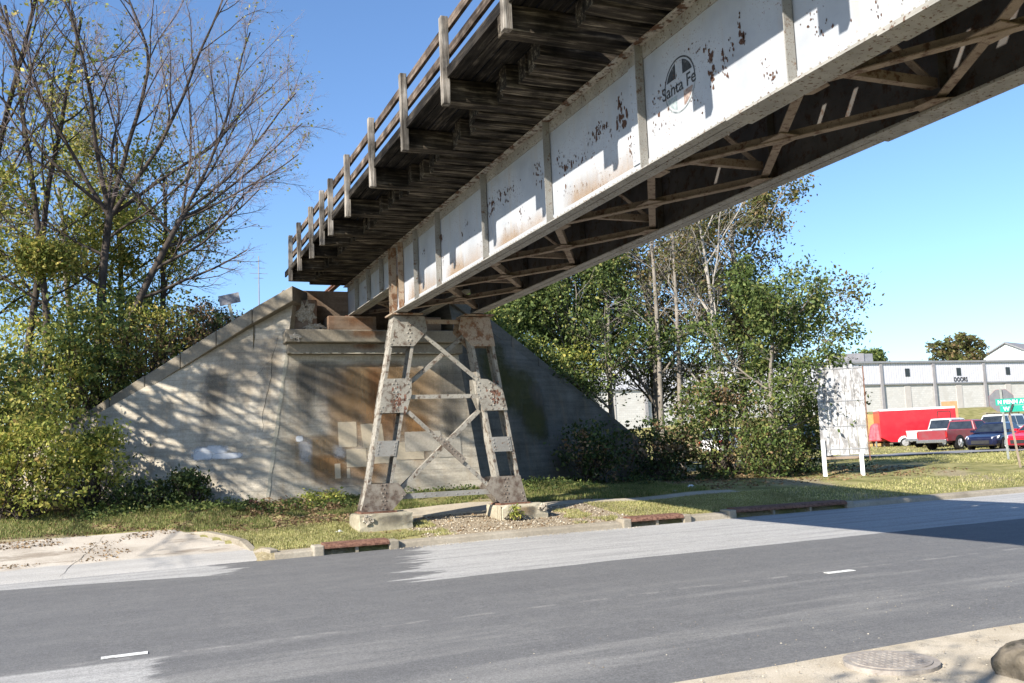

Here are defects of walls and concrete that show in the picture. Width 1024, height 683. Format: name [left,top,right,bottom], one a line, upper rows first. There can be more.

rust [336,364,434,434]